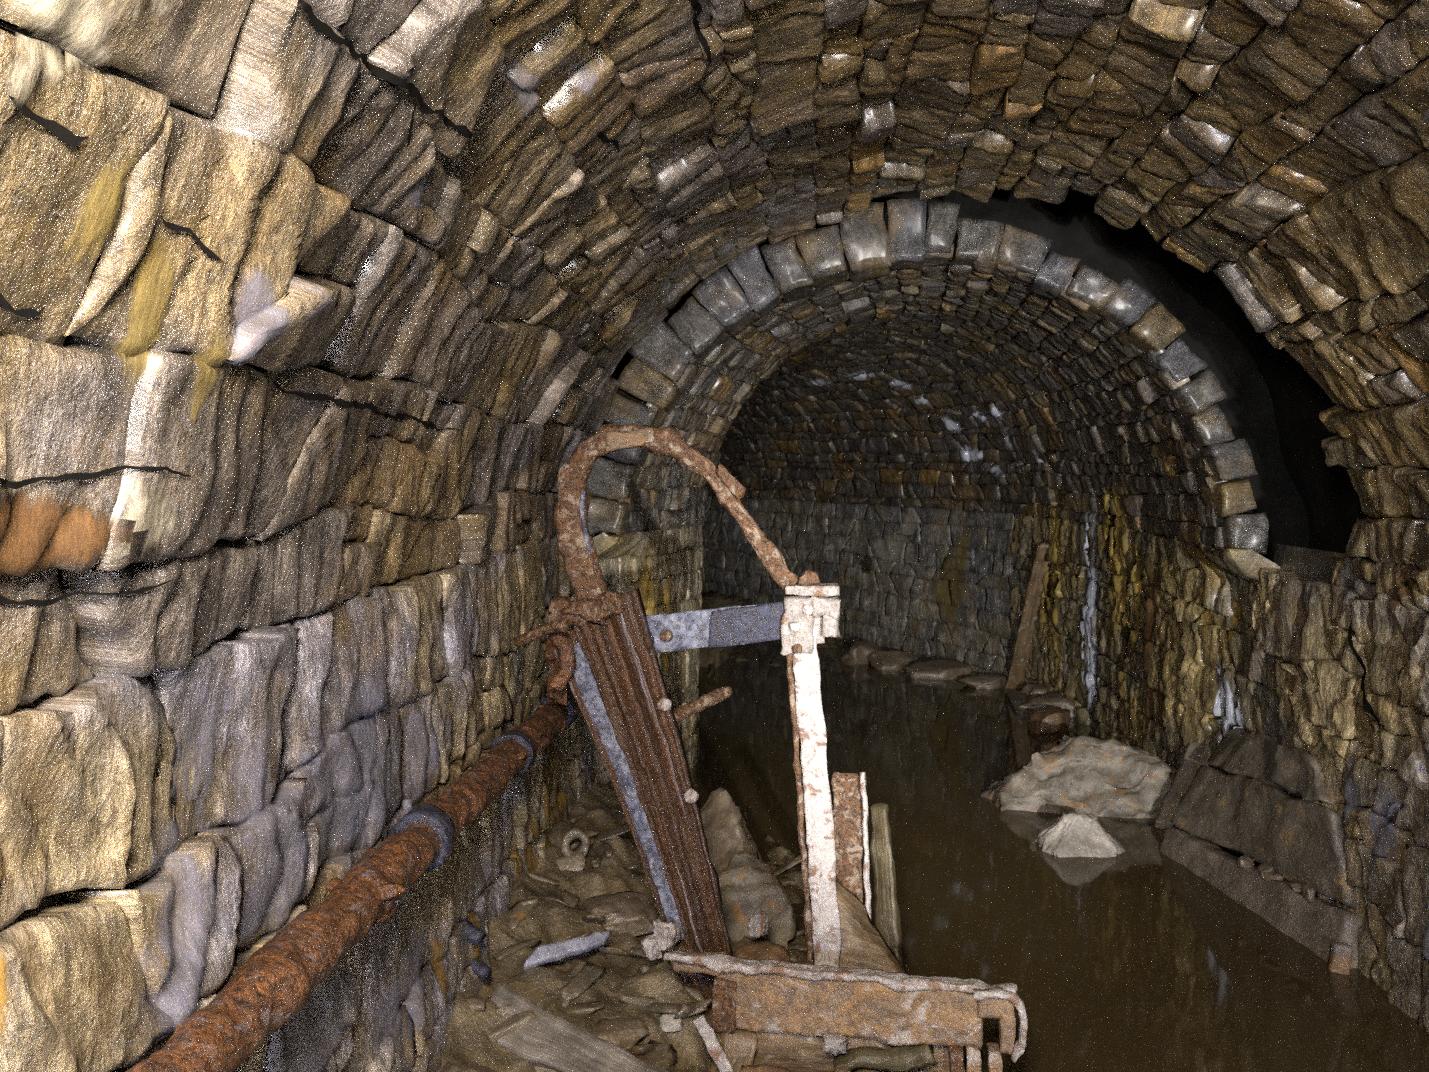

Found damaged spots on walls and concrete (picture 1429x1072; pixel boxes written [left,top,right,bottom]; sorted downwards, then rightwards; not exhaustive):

crack [298,0,472,149]
crack [8,95,89,147]
crack [0,292,47,318]
crack [0,465,192,489]
rust [0,493,124,582]